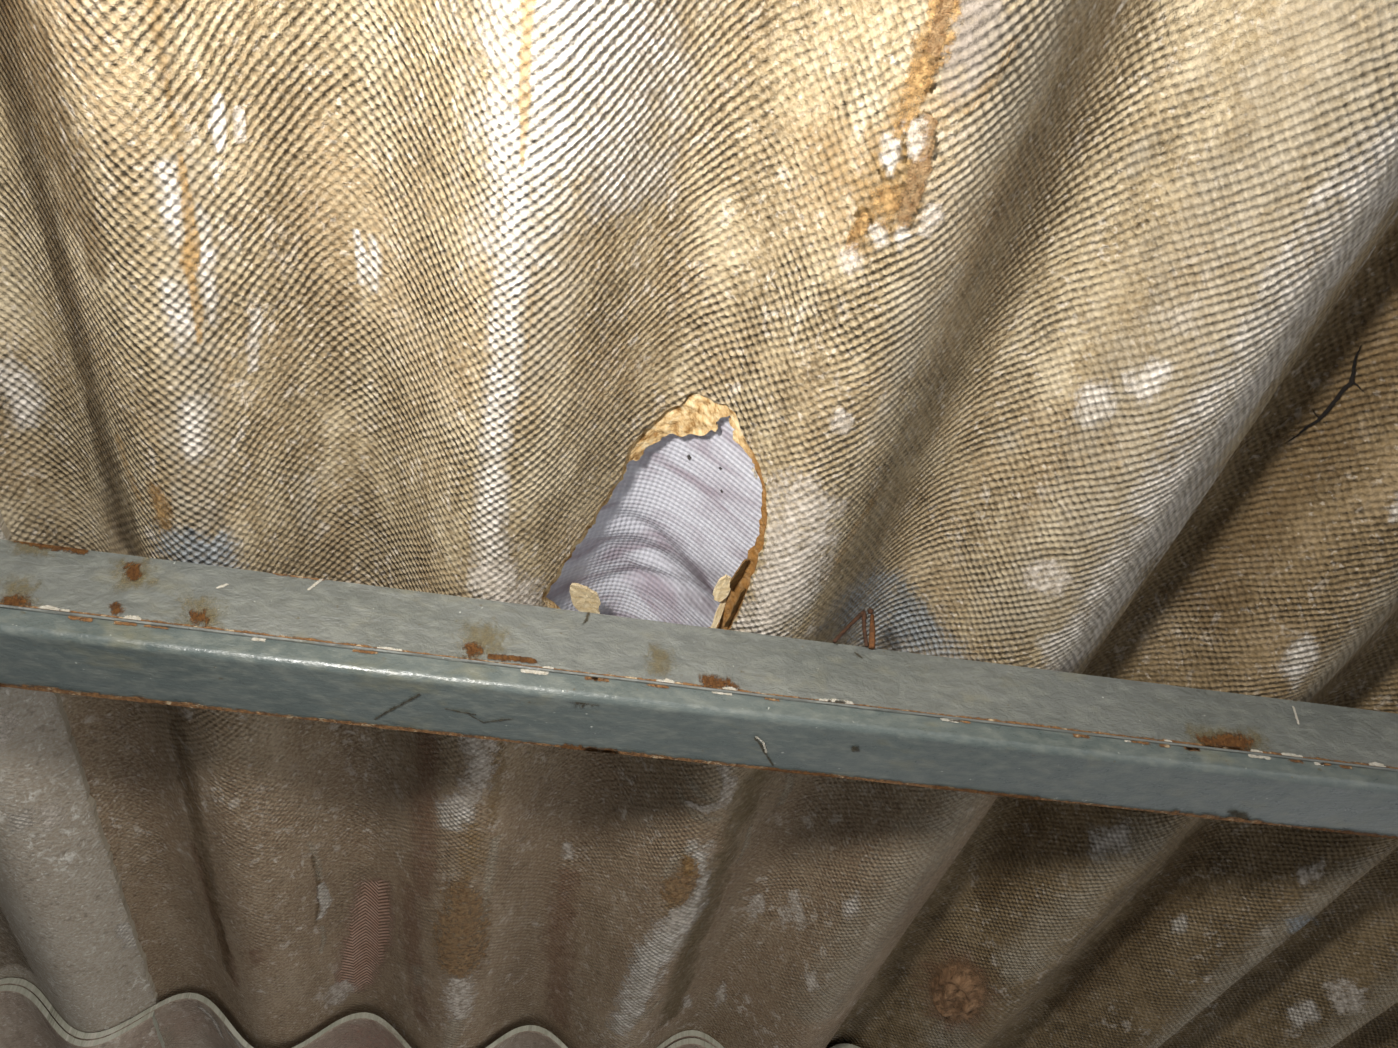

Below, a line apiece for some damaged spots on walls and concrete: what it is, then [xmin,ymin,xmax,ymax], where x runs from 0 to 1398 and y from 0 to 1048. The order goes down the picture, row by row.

rust [519,0,536,163]
rust [845,0,962,258]
crack [1286,345,1365,443]
rust [13,541,88,555]
rust [123,561,142,581]
hole [541,392,767,630]
rust [0,593,1398,769]
rust [0,683,1398,839]